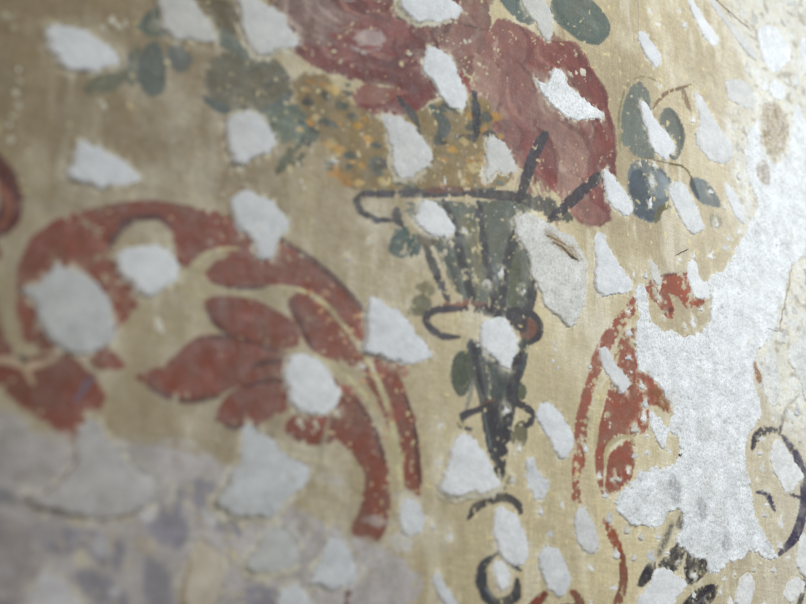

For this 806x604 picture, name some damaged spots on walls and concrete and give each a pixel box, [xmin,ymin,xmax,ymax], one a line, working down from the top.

flaking render [393,0,463,28]
flaking render [229,189,289,261]
flaking render [21,263,117,359]
flaking render [115,244,180,298]
flaking render [360,296,433,372]
peeling [512,0,806,604]
flaking render [282,353,340,416]
flaking render [207,424,311,526]
flaking render [435,433,571,598]
flaking render [177,539,225,604]
flaking render [276,537,357,604]